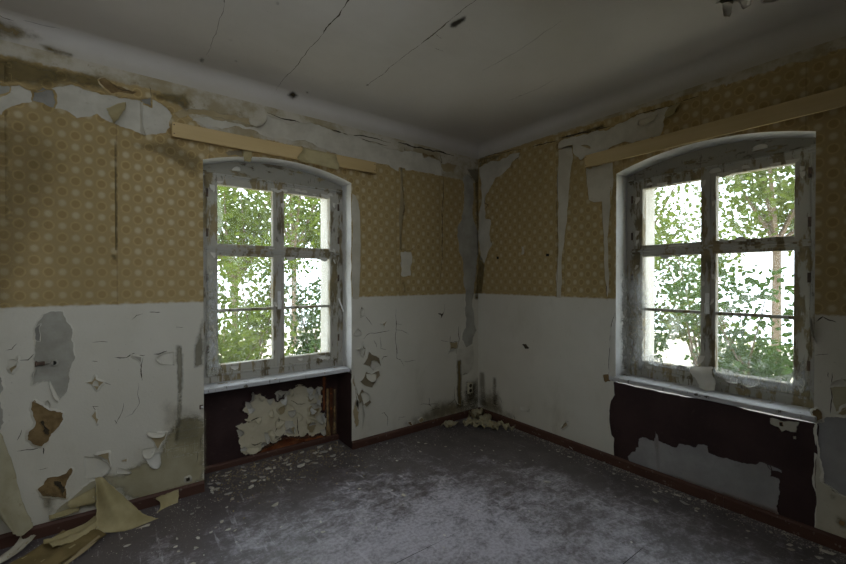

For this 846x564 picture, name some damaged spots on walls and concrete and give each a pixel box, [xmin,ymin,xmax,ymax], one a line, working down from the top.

crack [280,0,349,84]
crack [368,0,476,85]
spalling [715,0,778,17]
peeling [0,76,442,177]
peeling [557,105,672,161]
peeling [6,310,76,449]
peeling [36,418,205,505]
peeling [234,382,327,456]
spalling [769,417,800,439]
peeling [809,376,846,497]